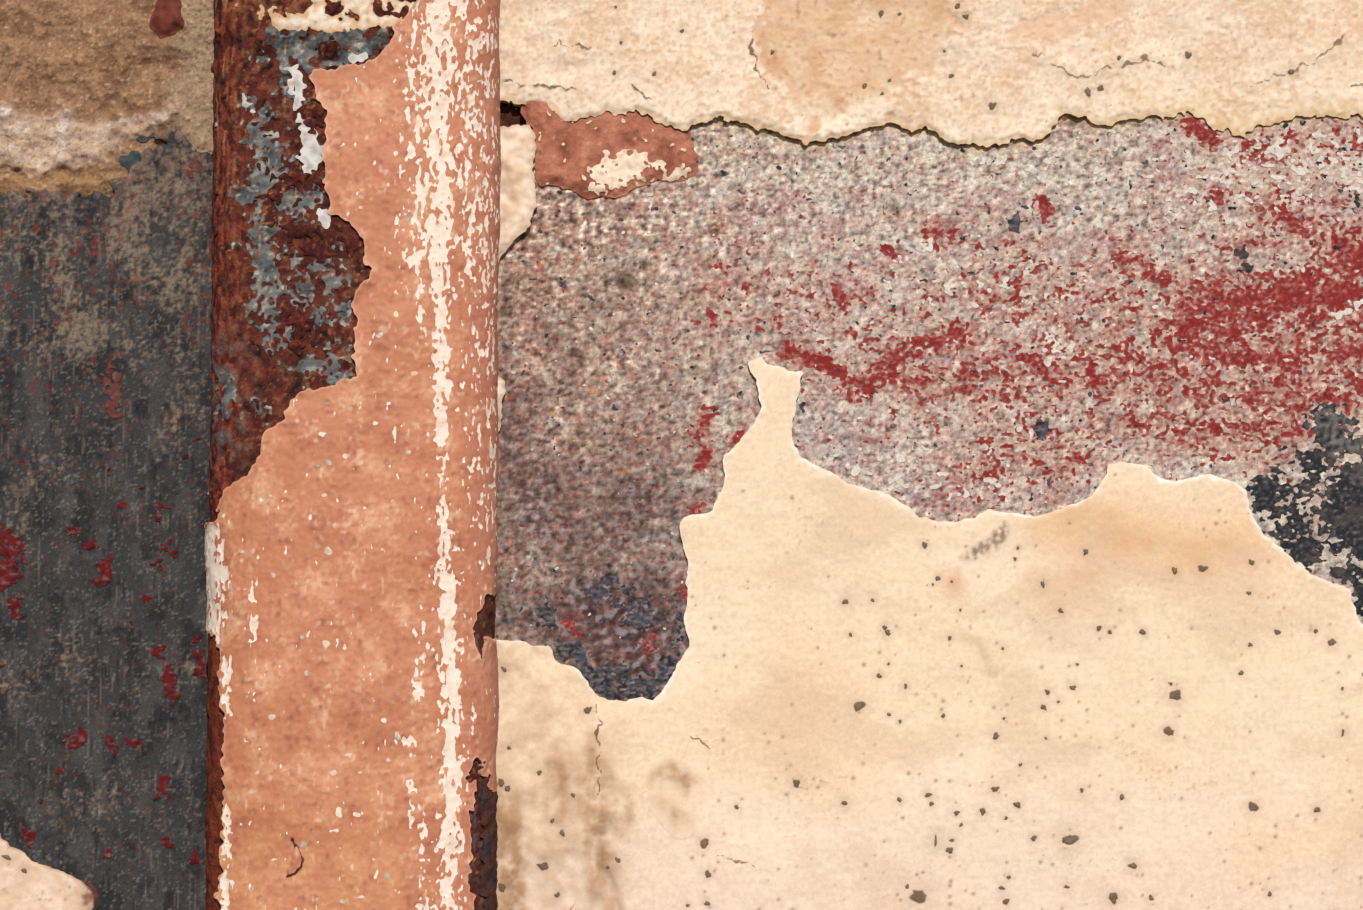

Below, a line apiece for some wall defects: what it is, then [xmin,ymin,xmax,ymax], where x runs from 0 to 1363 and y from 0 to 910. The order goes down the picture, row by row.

peeling [0,0,280,910]
rust [208,0,417,522]
peeling [296,611,354,650]
rust [465,758,498,910]
rust [473,594,496,659]
peeling [344,0,1363,910]